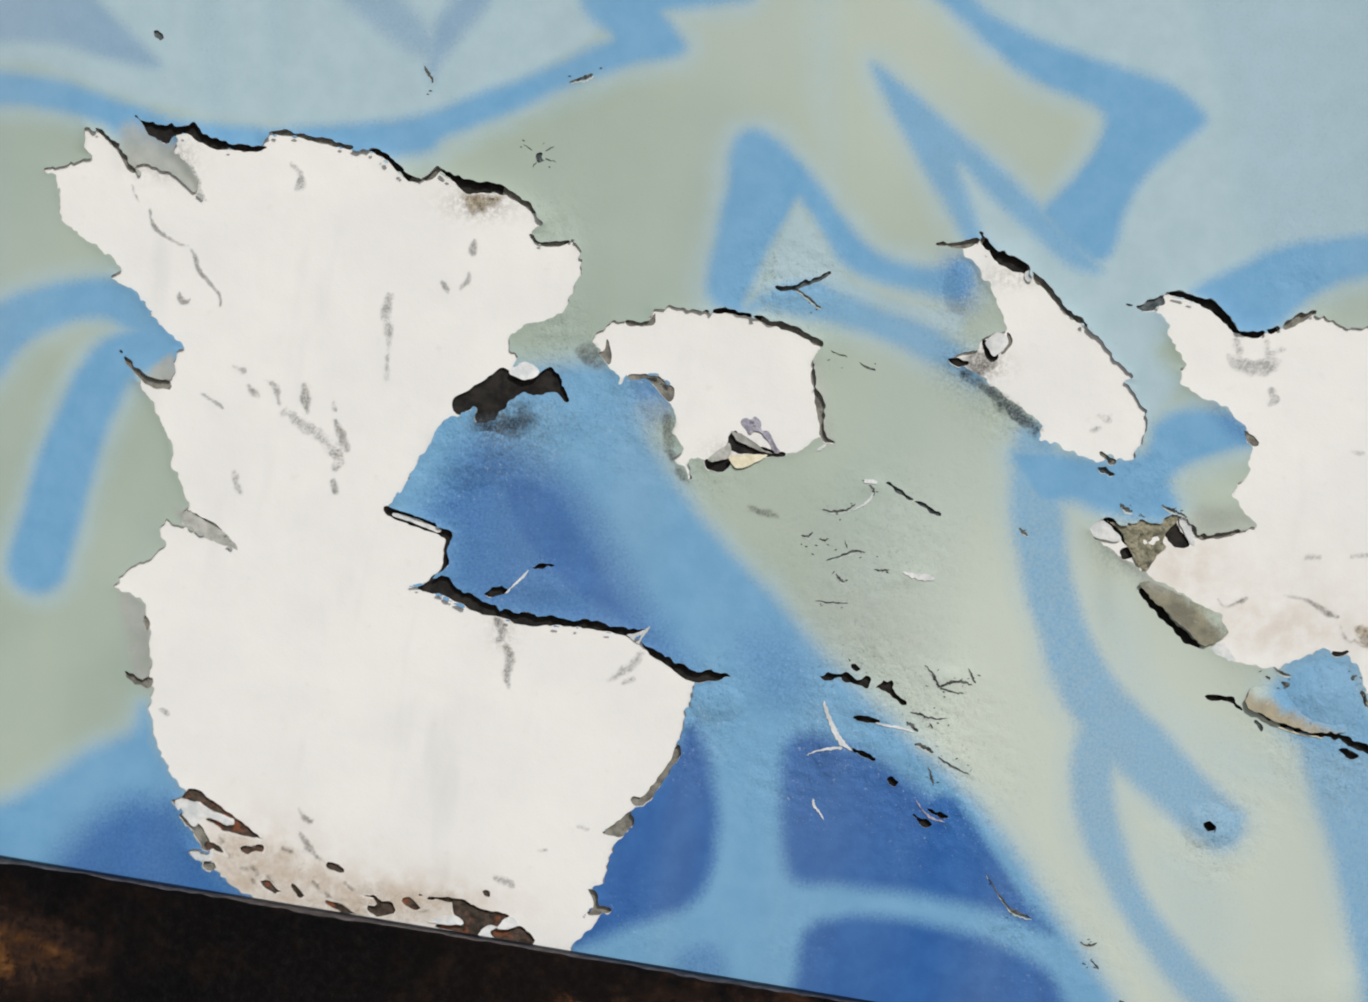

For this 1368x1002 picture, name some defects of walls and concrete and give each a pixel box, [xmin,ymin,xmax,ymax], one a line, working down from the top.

peeling [593,305,835,483]
peeling [936,231,1148,477]
peeling [44,115,730,951]
peeling [1090,290,1368,707]
peeling [1245,686,1358,760]
corrosion [261,880,304,898]
corrosion [325,890,535,944]
peeling [913,809,948,827]